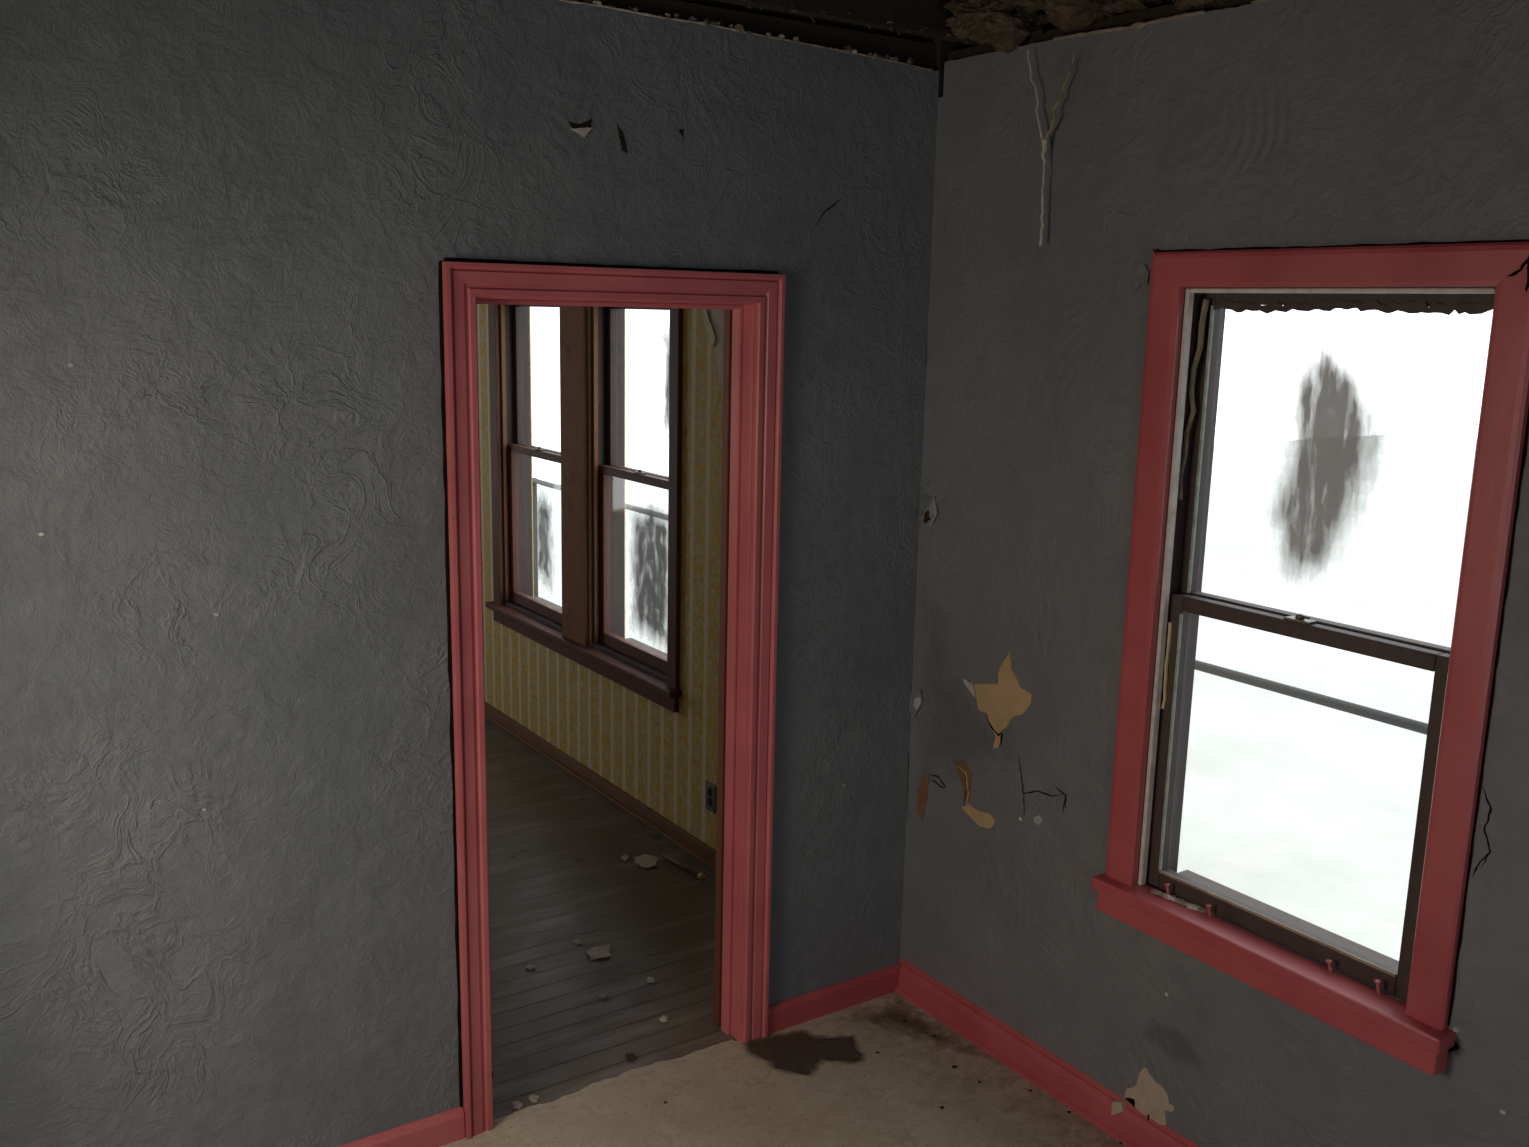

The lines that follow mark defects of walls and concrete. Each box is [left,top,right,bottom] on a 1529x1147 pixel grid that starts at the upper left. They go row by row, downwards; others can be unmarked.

flaking render [561,0,931,70]
flaking render [1053,11,1208,41]
peeling [963,652,1032,749]
peeling [916,759,996,829]
peeling [1111,1068,1174,1126]